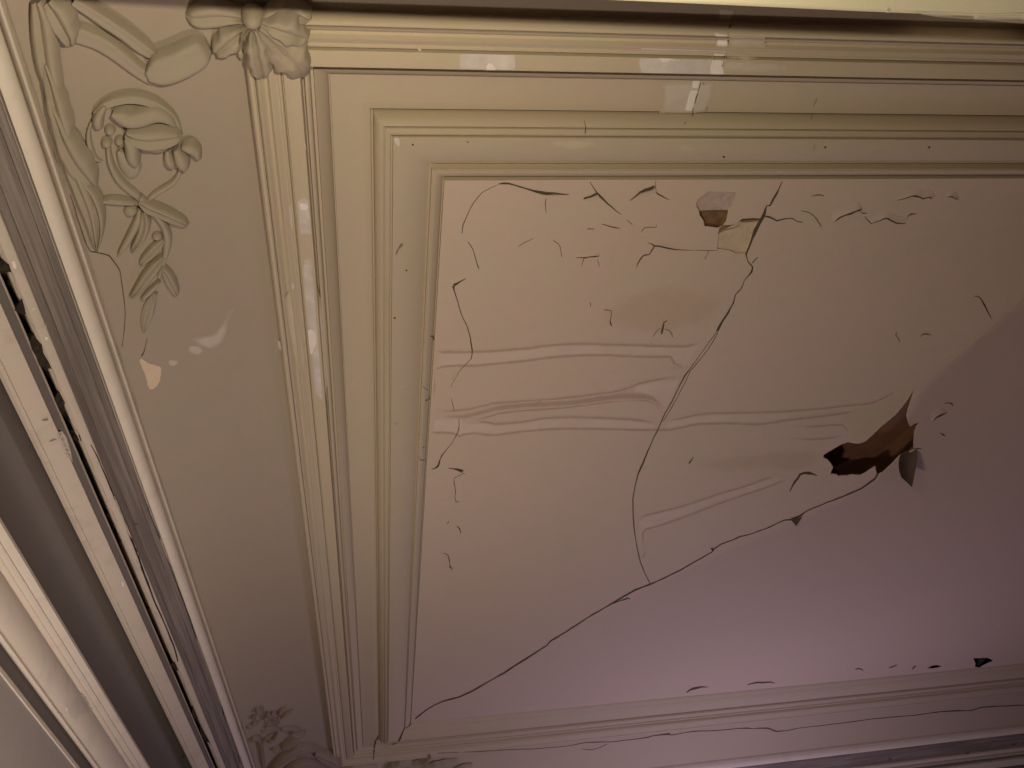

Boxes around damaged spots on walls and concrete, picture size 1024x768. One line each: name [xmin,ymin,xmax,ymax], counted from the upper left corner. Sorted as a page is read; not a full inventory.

crack [0,253,241,768]
peeling [139,358,162,390]
crack [373,181,1024,760]
peeling [696,191,760,253]